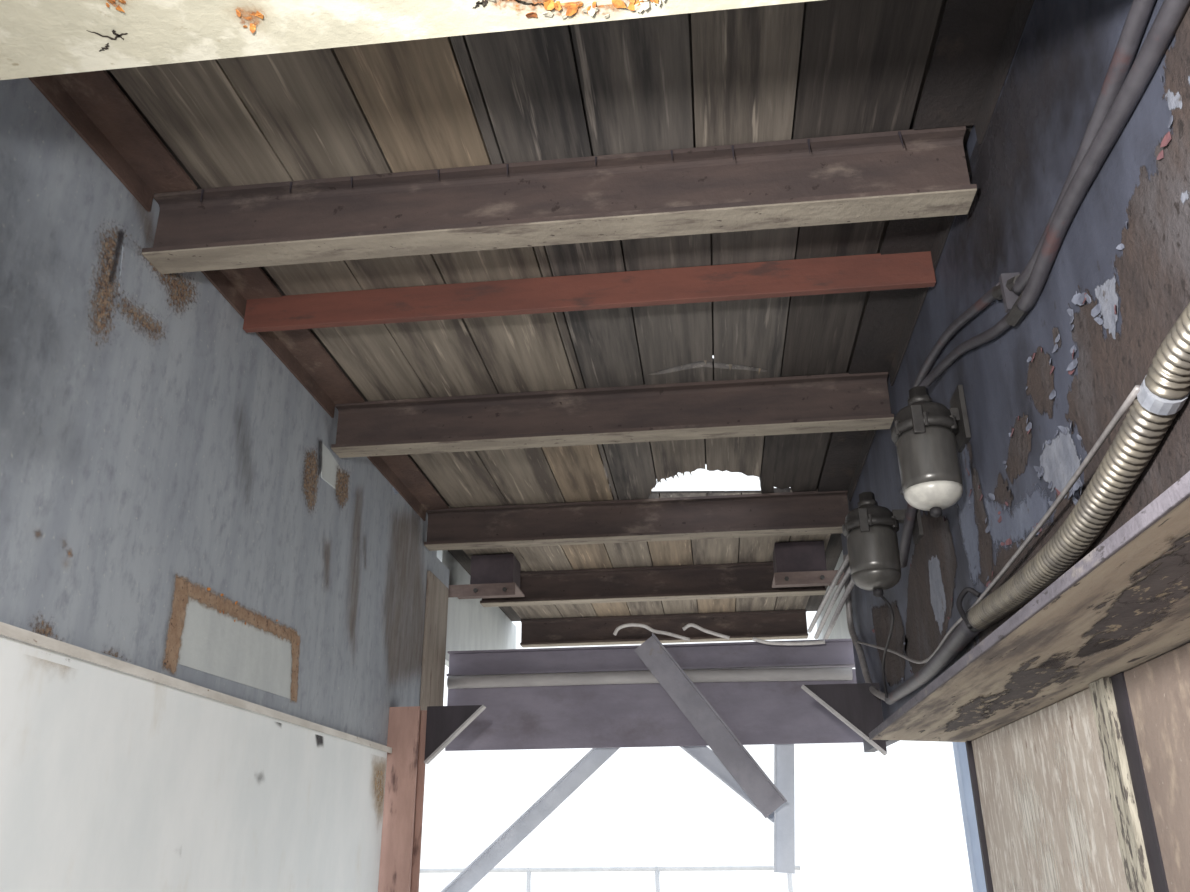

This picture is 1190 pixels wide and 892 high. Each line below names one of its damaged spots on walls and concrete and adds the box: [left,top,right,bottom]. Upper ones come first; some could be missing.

rust [236,9,264,34]
rust [525,0,598,19]
rust [612,0,665,12]
crack [86,29,128,52]
peeling [870,5,1190,687]
peeling [944,534,1190,732]